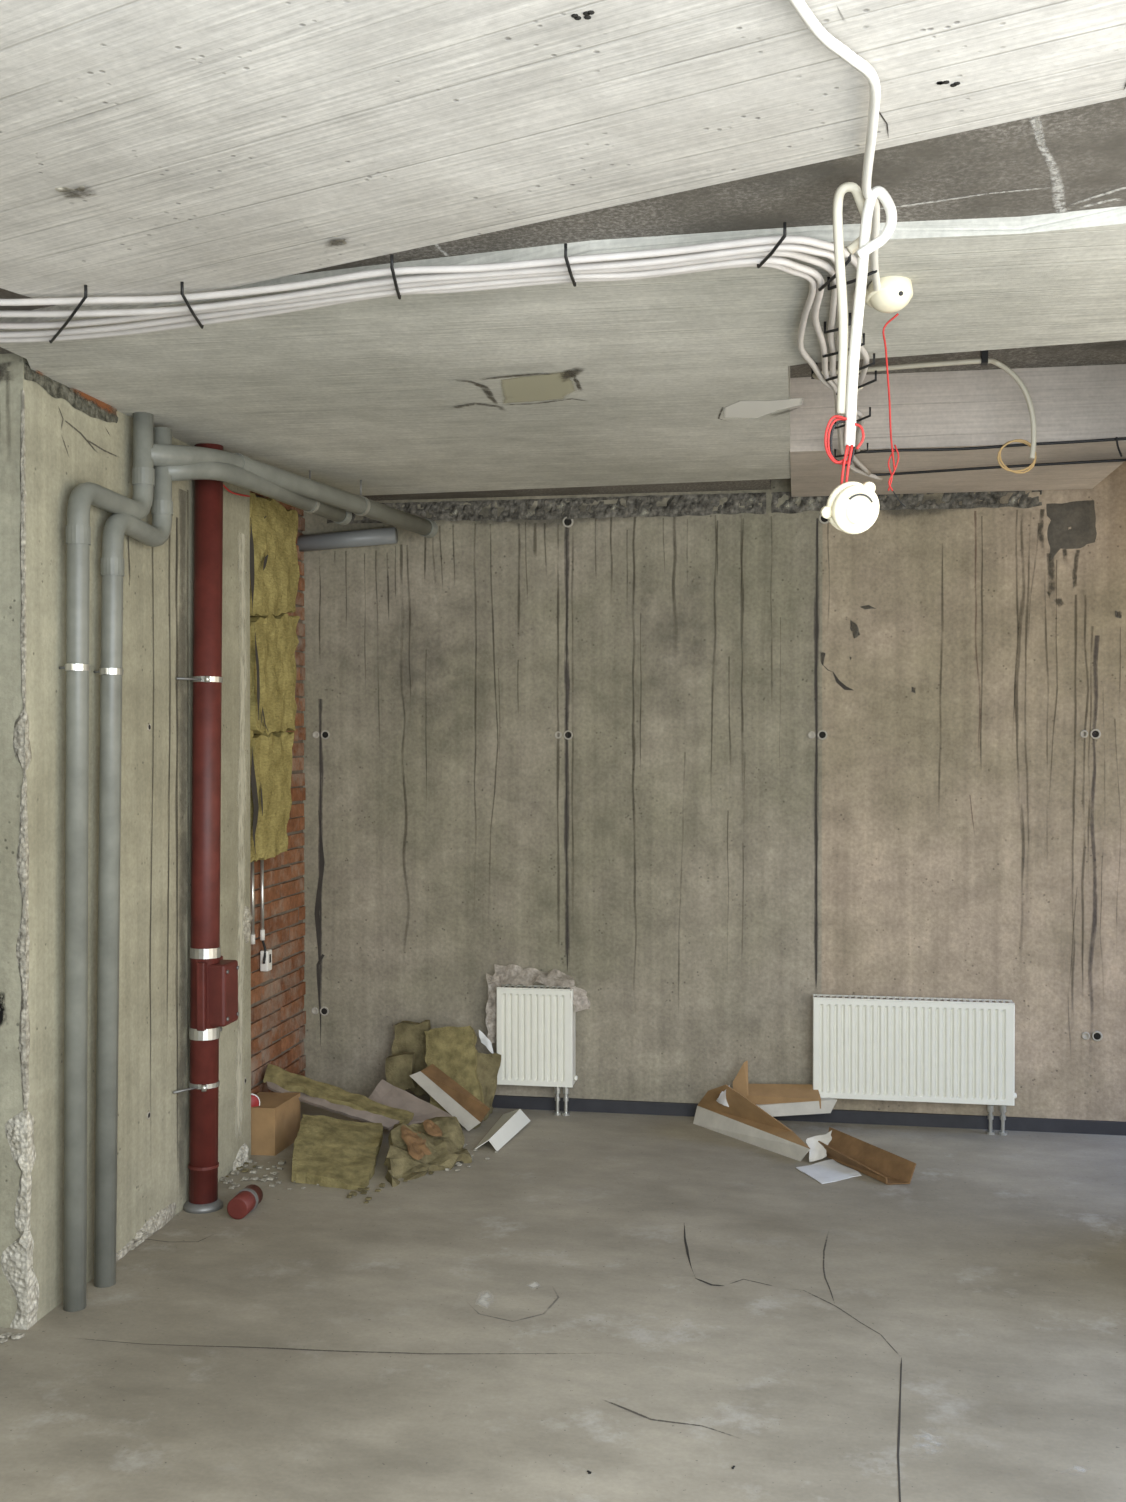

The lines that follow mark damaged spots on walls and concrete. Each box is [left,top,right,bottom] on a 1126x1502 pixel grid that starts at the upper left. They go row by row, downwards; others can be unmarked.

spalling [1,390,39,1330]
crack [684,1225,771,1286]
crack [814,1240,896,1352]
crack [90,1339,557,1354]
crack [611,1402,724,1433]